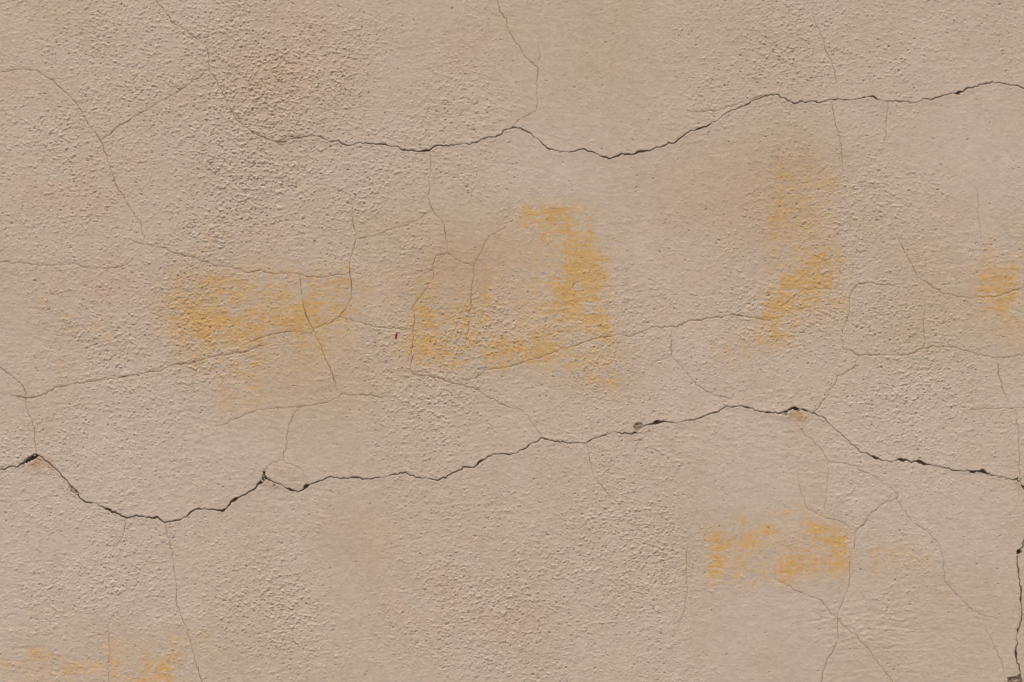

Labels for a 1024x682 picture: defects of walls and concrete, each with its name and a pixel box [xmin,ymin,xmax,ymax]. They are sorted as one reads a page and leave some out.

crack [1,0,1024,299]
crack [0,231,1024,682]